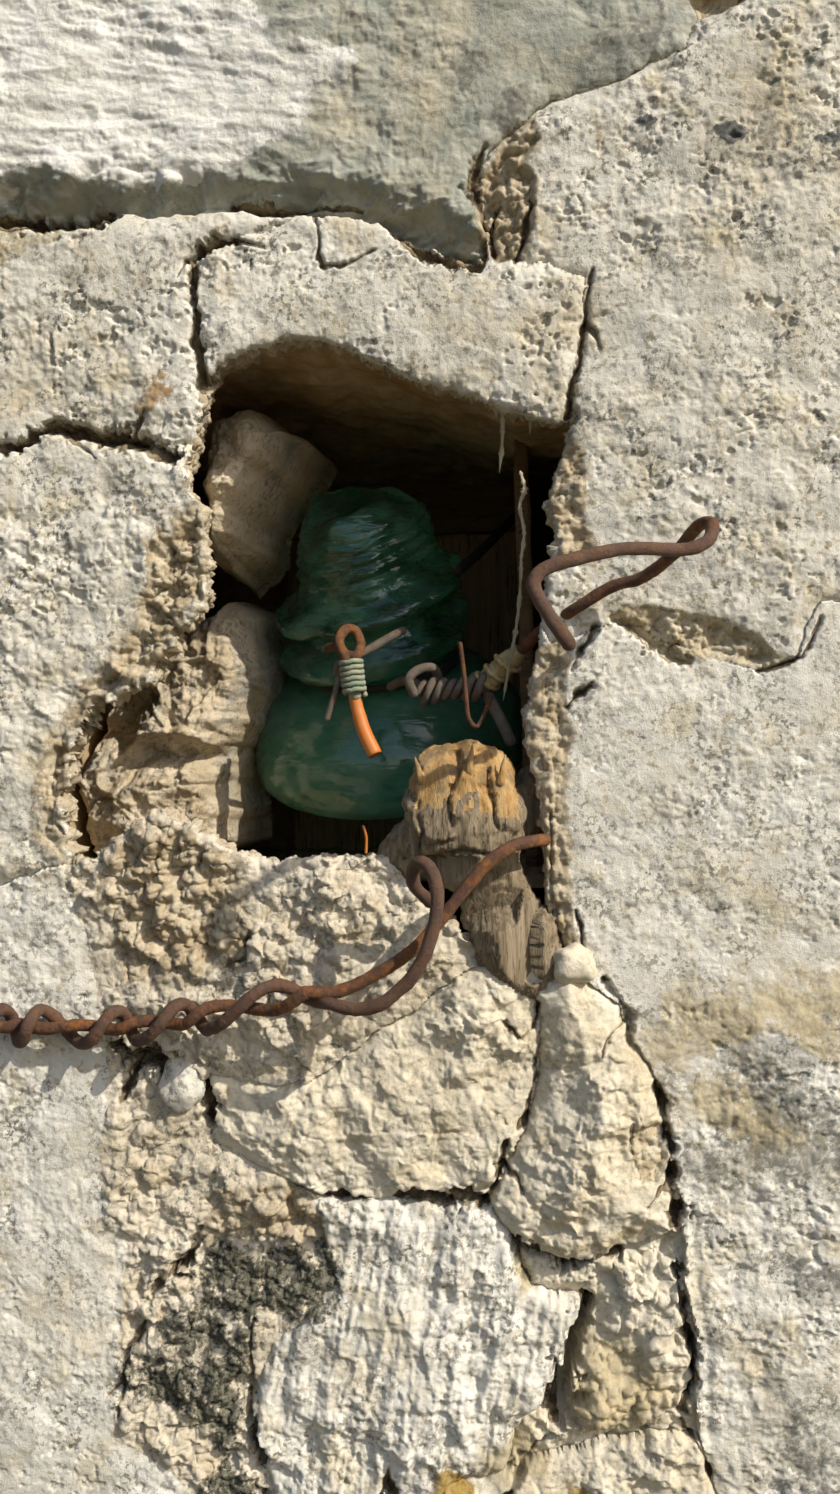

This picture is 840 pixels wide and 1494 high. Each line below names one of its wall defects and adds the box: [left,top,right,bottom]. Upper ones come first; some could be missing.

crack [313,217,375,270]
crack [564,269,601,424]
crack [0,410,182,466]
spalling [548,438,599,571]
spalling [31,500,210,861]
spalling [526,603,821,948]
spalling [93,812,248,987]
crack [109,1039,169,1104]
crack [200,1079,218,1122]
crack [291,1002,541,1207]
crack [108,1237,200,1418]
crack [648,1081,713,1480]